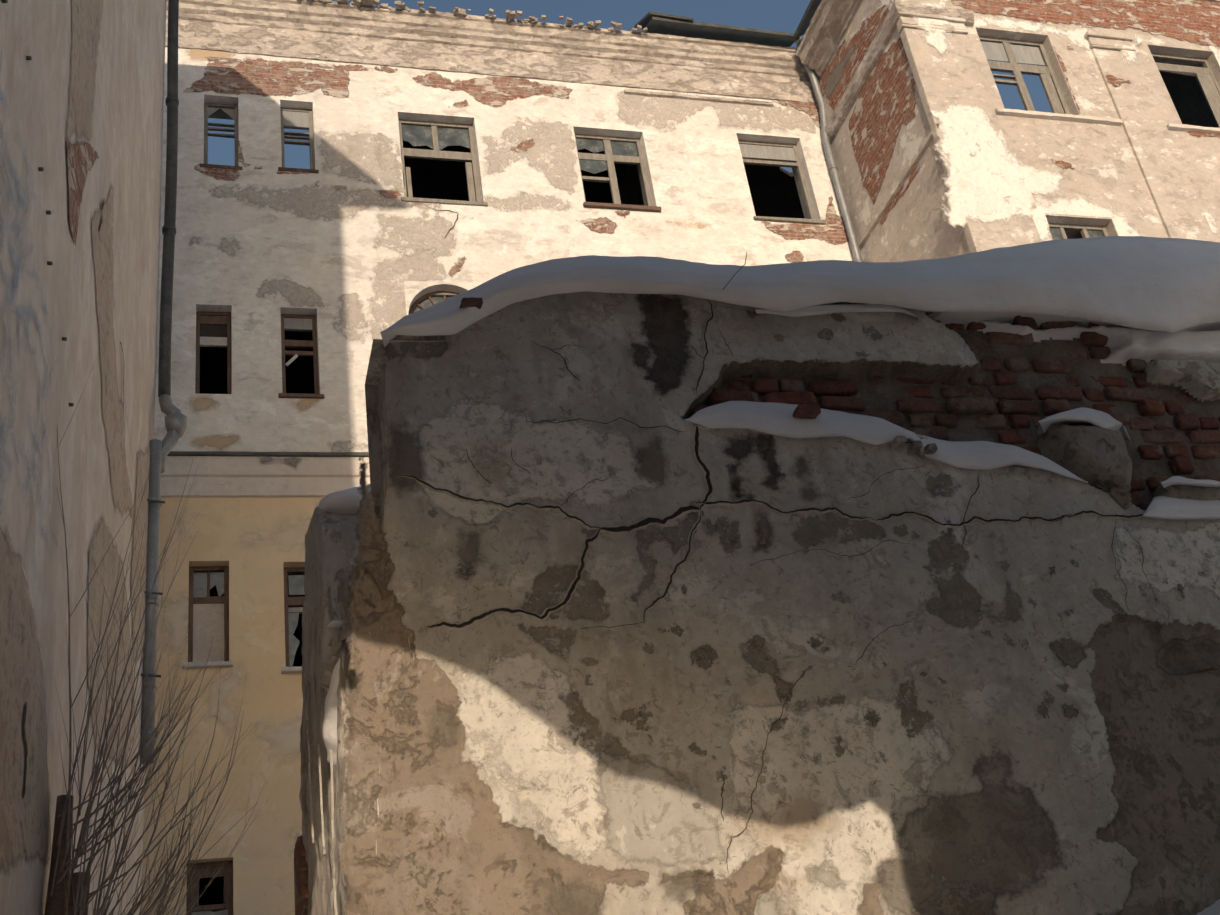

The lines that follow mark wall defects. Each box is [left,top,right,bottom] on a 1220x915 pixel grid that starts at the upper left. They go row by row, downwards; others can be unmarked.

spalling [184,57,397,98]
spalling [413,72,572,107]
spalling [618,0,919,225]
peeling [931,104,1141,241]
spalling [916,0,1220,113]
flaking render [66,0,150,769]
crack [533,342,589,381]
crack [691,299,734,395]
spalling [682,312,1220,510]
crack [398,409,1157,631]
flaking render [332,441,1067,915]
flaking render [1049,588,1220,915]